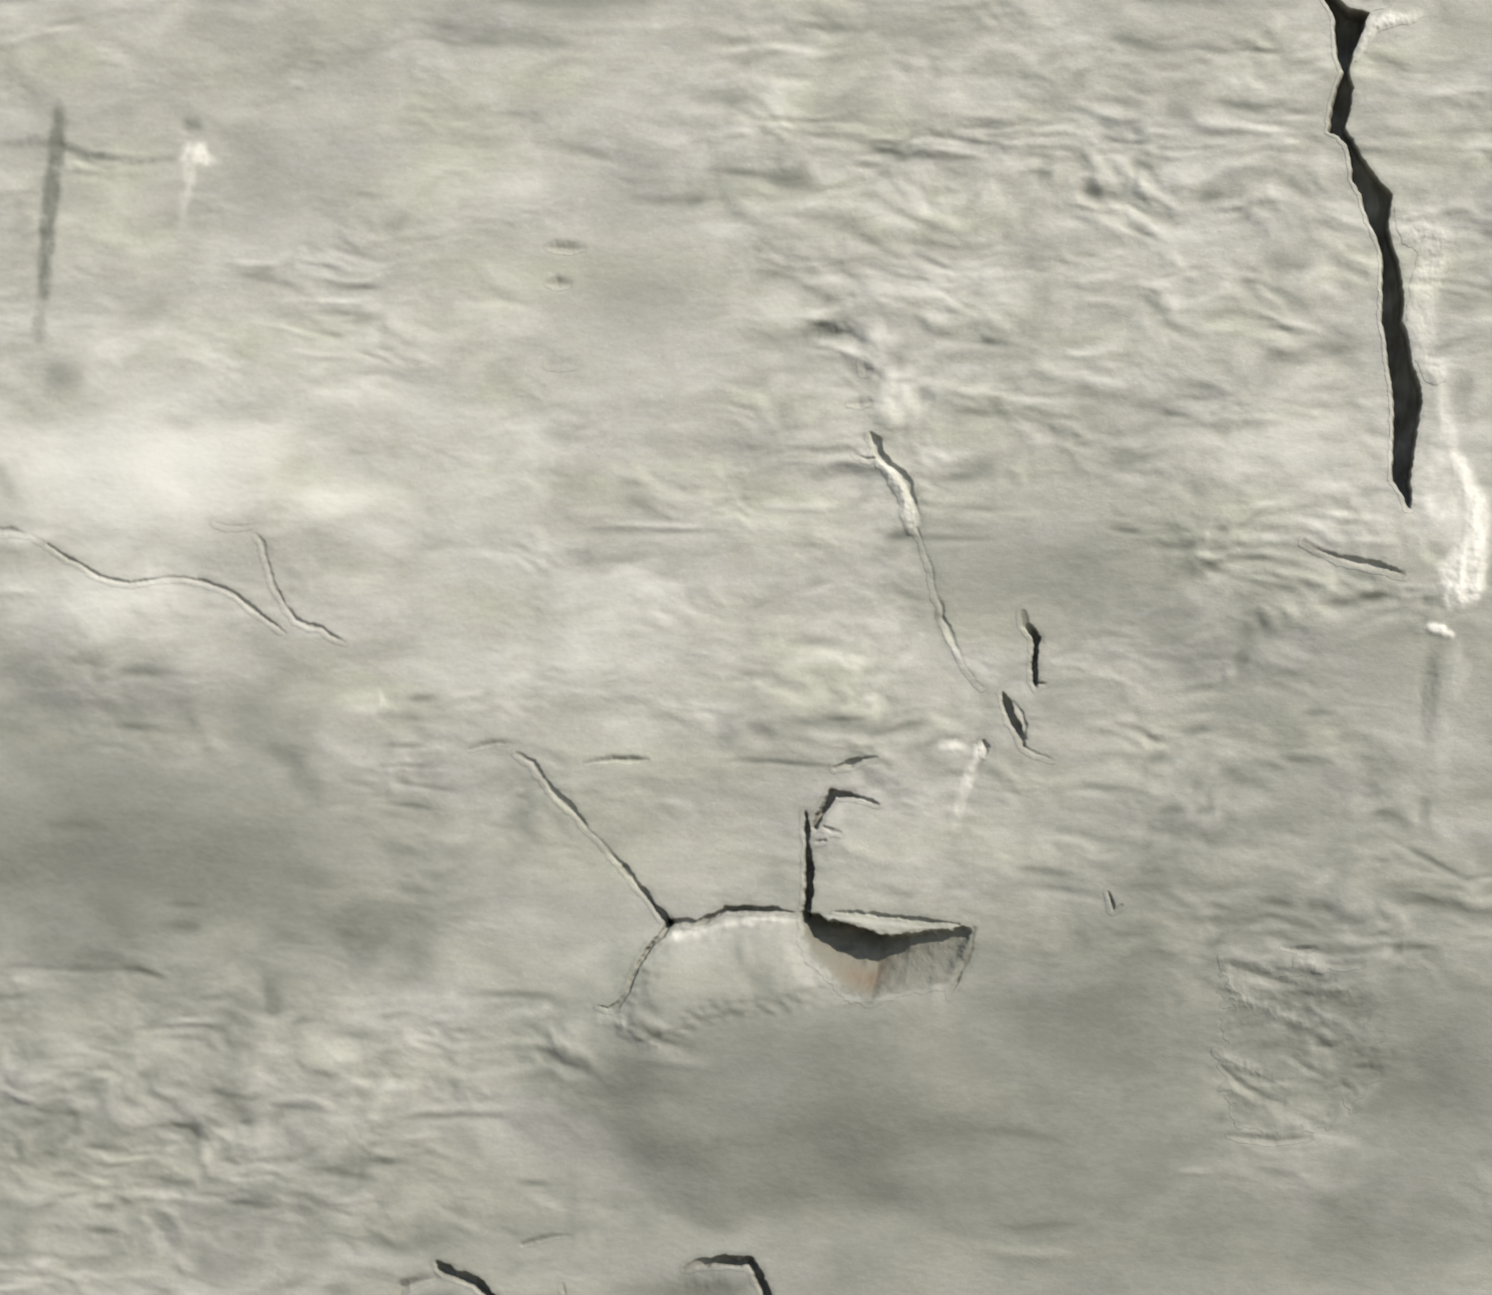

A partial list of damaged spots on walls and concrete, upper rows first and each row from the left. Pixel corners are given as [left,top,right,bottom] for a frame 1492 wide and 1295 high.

water stain [30,100,218,346]
crack [1320,0,1456,513]
crack [0,518,350,647]
crack [851,427,1058,764]
crack [466,739,883,1015]
peeling [595,906,979,1057]
crack [391,1256,501,1295]
crack [520,1233,573,1248]
crack [680,1251,774,1295]